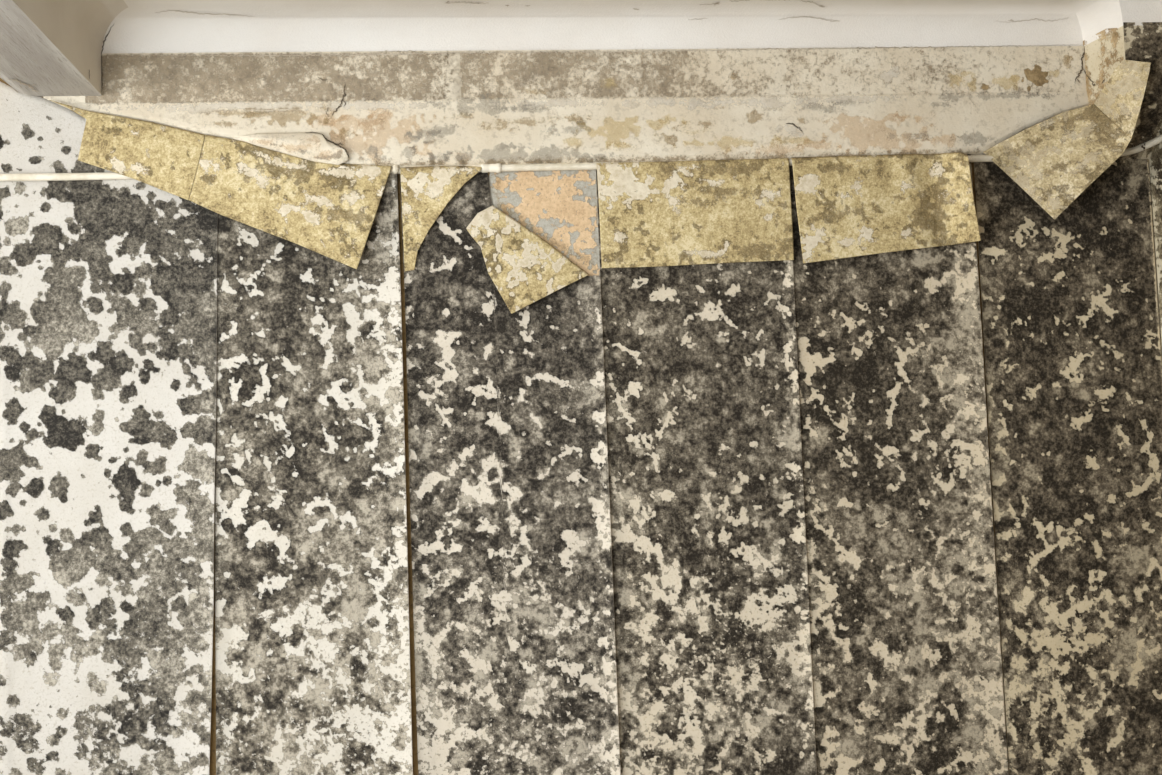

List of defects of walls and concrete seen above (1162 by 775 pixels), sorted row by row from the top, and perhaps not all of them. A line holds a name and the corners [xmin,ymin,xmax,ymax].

peeling [99,97,438,114]
leakage [85,50,768,104]
spalling [1022,65,1049,93]
peeling [1083,28,1123,105]
mould [21,123,44,164]
mould [49,141,105,173]
peeling [489,170,600,276]
leakage [0,172,413,775]
leakage [395,144,1162,775]